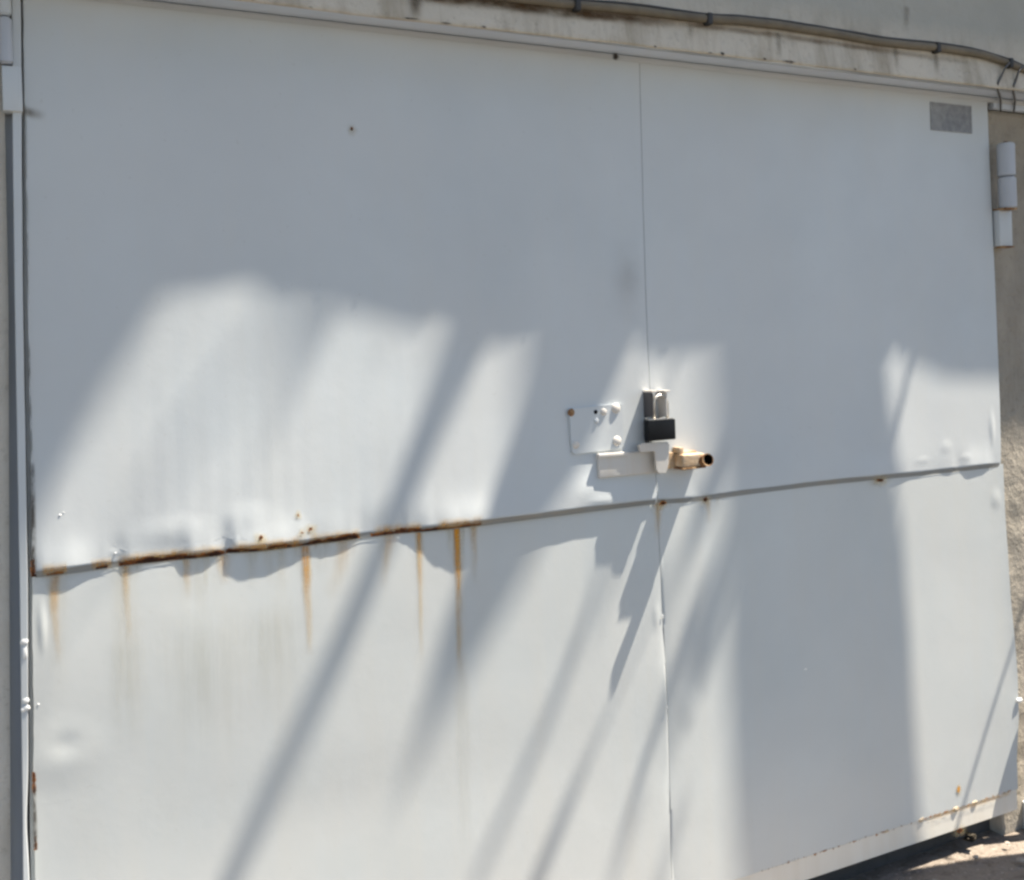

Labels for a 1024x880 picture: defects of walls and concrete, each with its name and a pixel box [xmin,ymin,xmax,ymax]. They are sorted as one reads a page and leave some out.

corrosion [30,547,66,577]
corrosion [96,522,481,581]